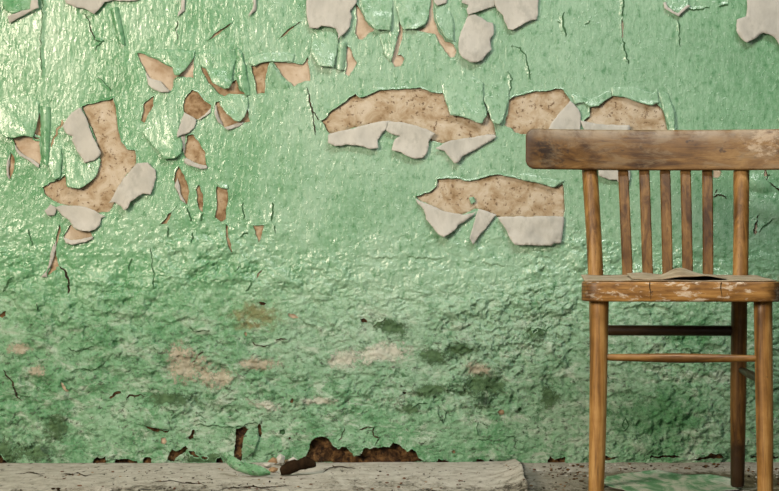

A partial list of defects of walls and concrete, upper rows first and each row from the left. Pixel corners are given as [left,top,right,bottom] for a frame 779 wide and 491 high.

peeling [736,0,779,44]
peeling [136,0,539,255]
peeling [319,76,675,163]
peeling [0,96,156,293]
peeling [414,173,567,246]
peeling [598,170,618,181]
crack [713,171,728,199]
flaking render [304,424,457,463]